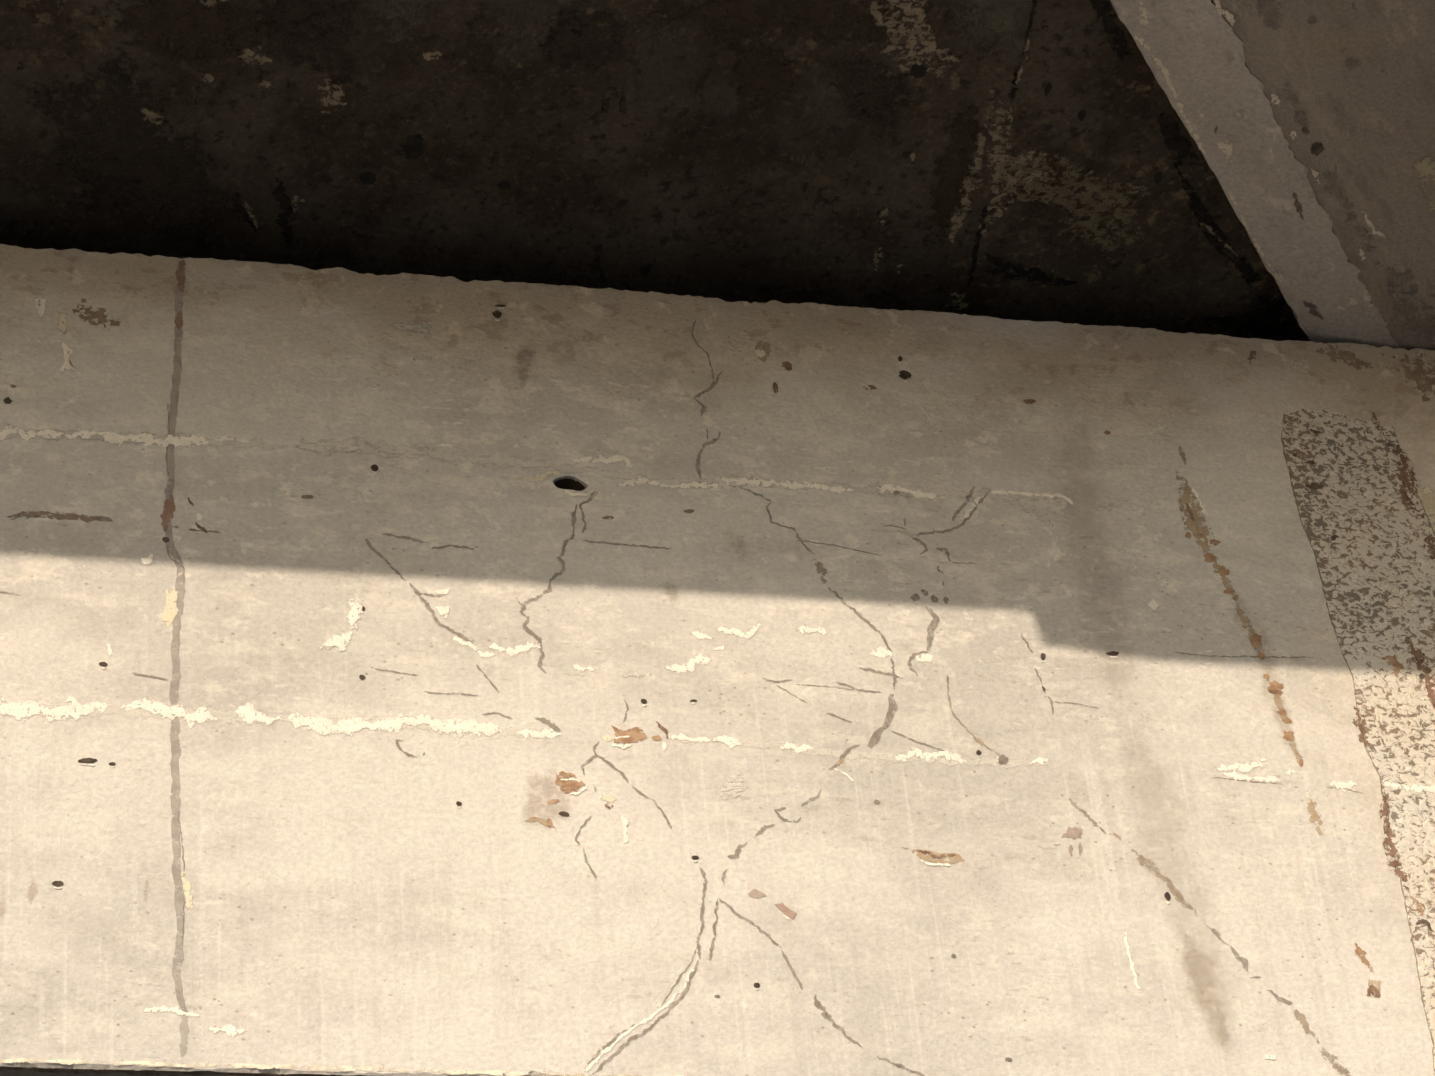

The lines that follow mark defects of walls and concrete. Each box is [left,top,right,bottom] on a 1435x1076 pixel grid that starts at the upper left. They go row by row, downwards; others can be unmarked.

crack [161,260,221,1076]
spalling [525,771,629,843]
crack [575,702,672,878]
spalling [602,722,668,751]
crack [566,802,925,1076]
crack [691,320,993,781]
crack [1079,809,1350,1076]
rust [1176,454,1304,767]
rust [1353,706,1373,751]
rust [1355,943,1381,997]
rust [1380,796,1434,932]
rust [1381,632,1435,732]